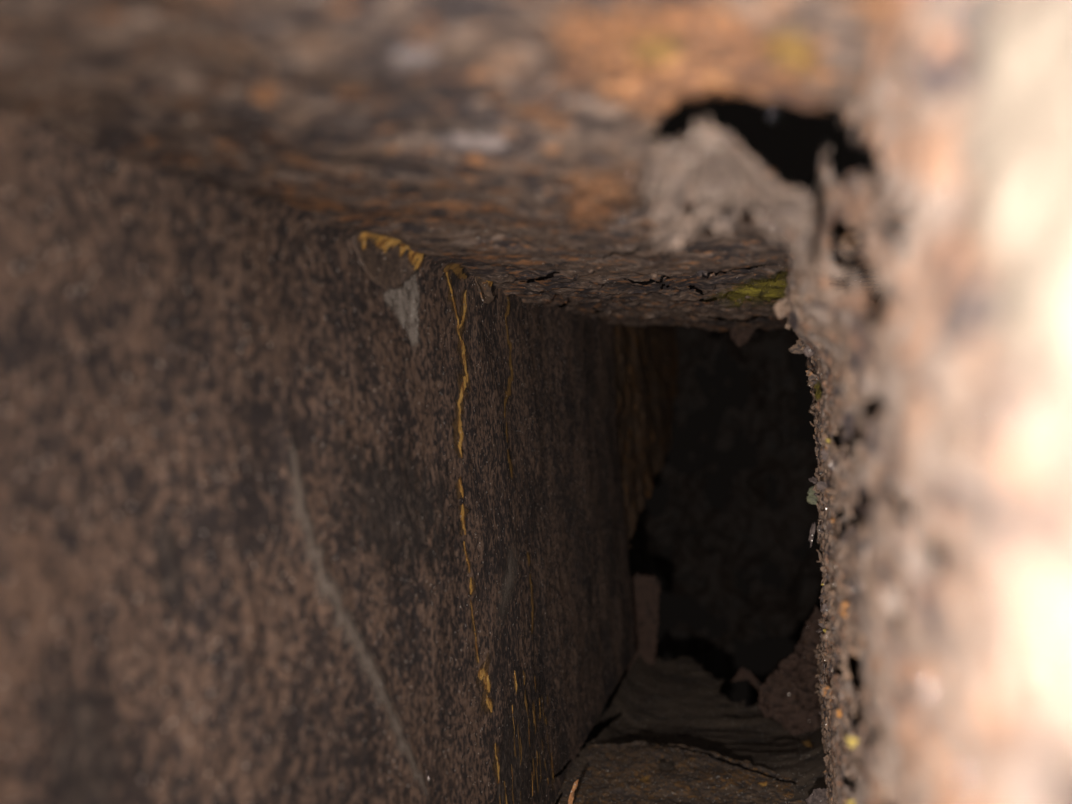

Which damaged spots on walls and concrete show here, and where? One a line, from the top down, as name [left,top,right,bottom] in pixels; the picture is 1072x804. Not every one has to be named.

corrosion [358,232,424,271]
crack [520,272,559,283]
crack [603,245,771,322]
corrosion [443,263,471,458]
corrosion [456,477,494,715]